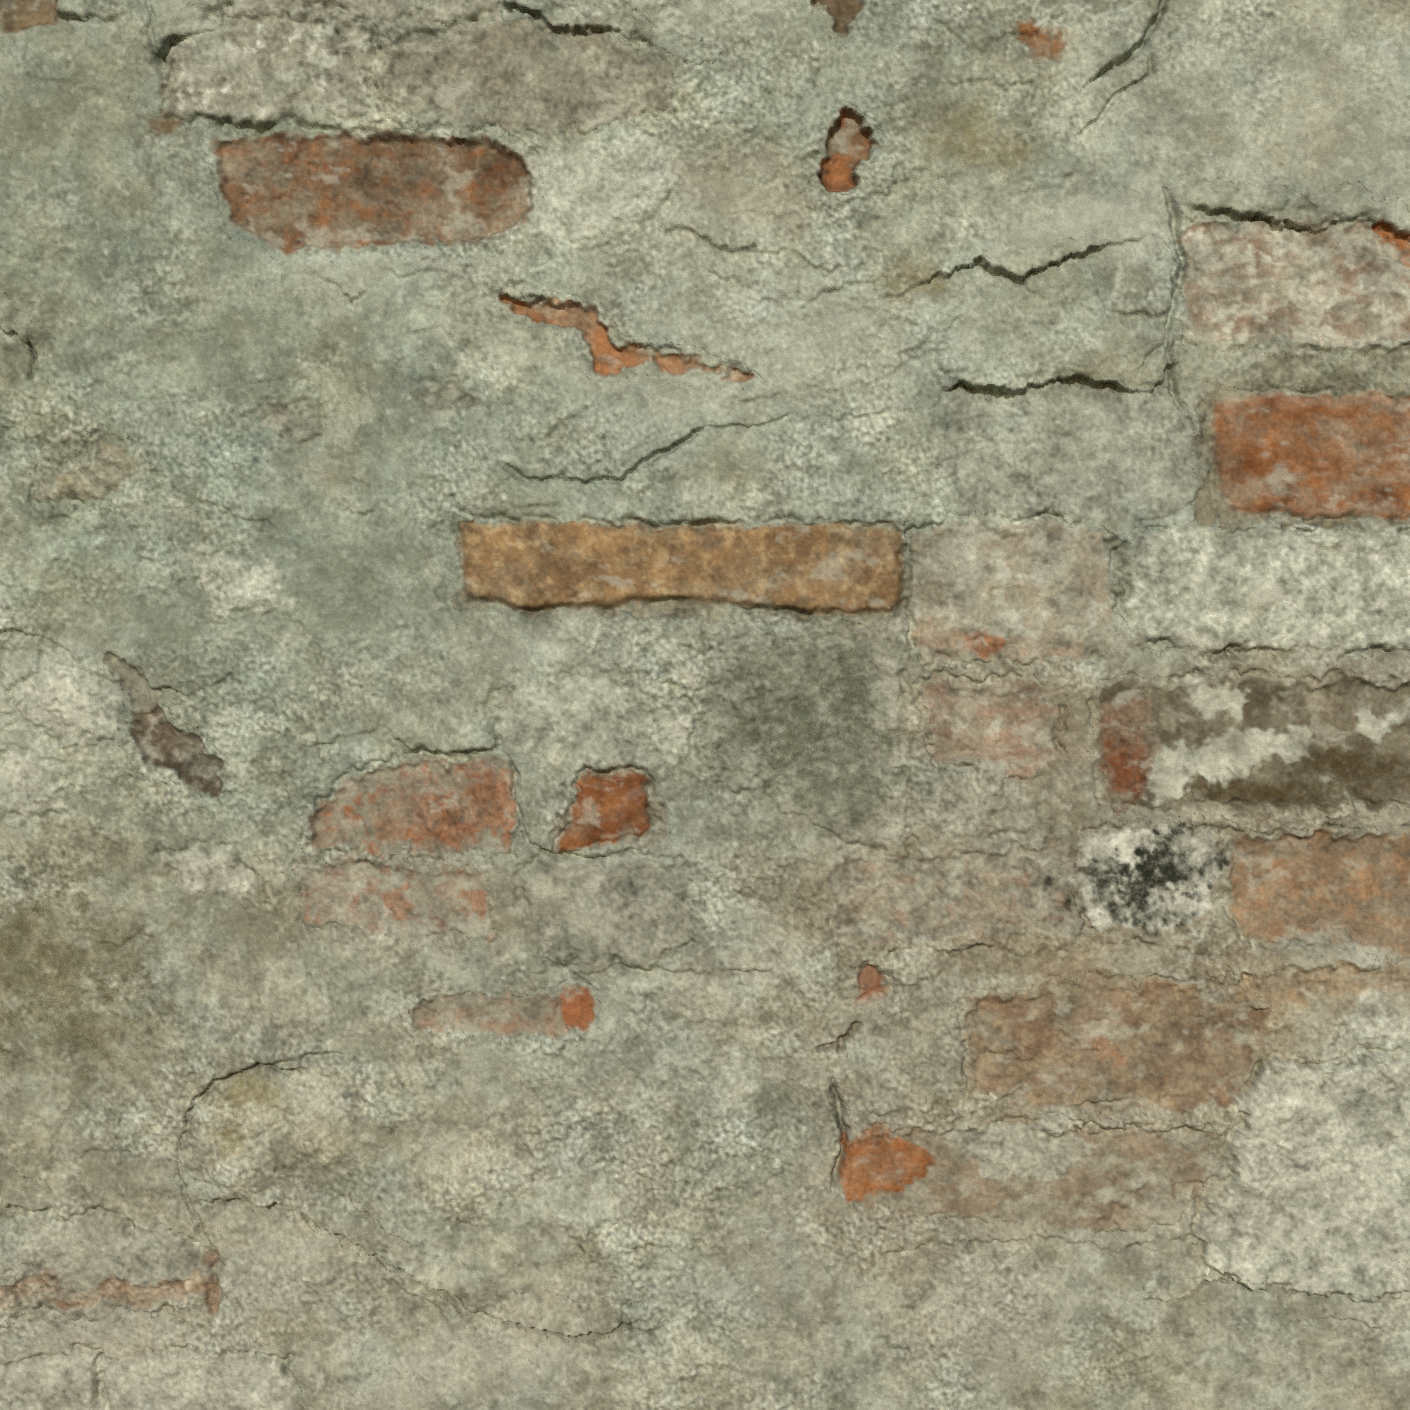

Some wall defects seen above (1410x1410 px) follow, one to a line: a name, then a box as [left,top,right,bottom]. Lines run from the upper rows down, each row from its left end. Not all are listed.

flaking render [125,0,720,263]
spalling [809,102,890,201]
crack [1075,0,1175,139]
flaking render [492,285,763,390]
flaking render [1173,179,1410,358]
flaking render [451,378,1410,979]
flaking render [294,747,522,945]
peeling [0,1155,51,1216]
crack [174,1050,350,1253]
peeling [196,1166,664,1343]
peeling [841,967,1410,1270]
flaking render [0,1344,304,1410]